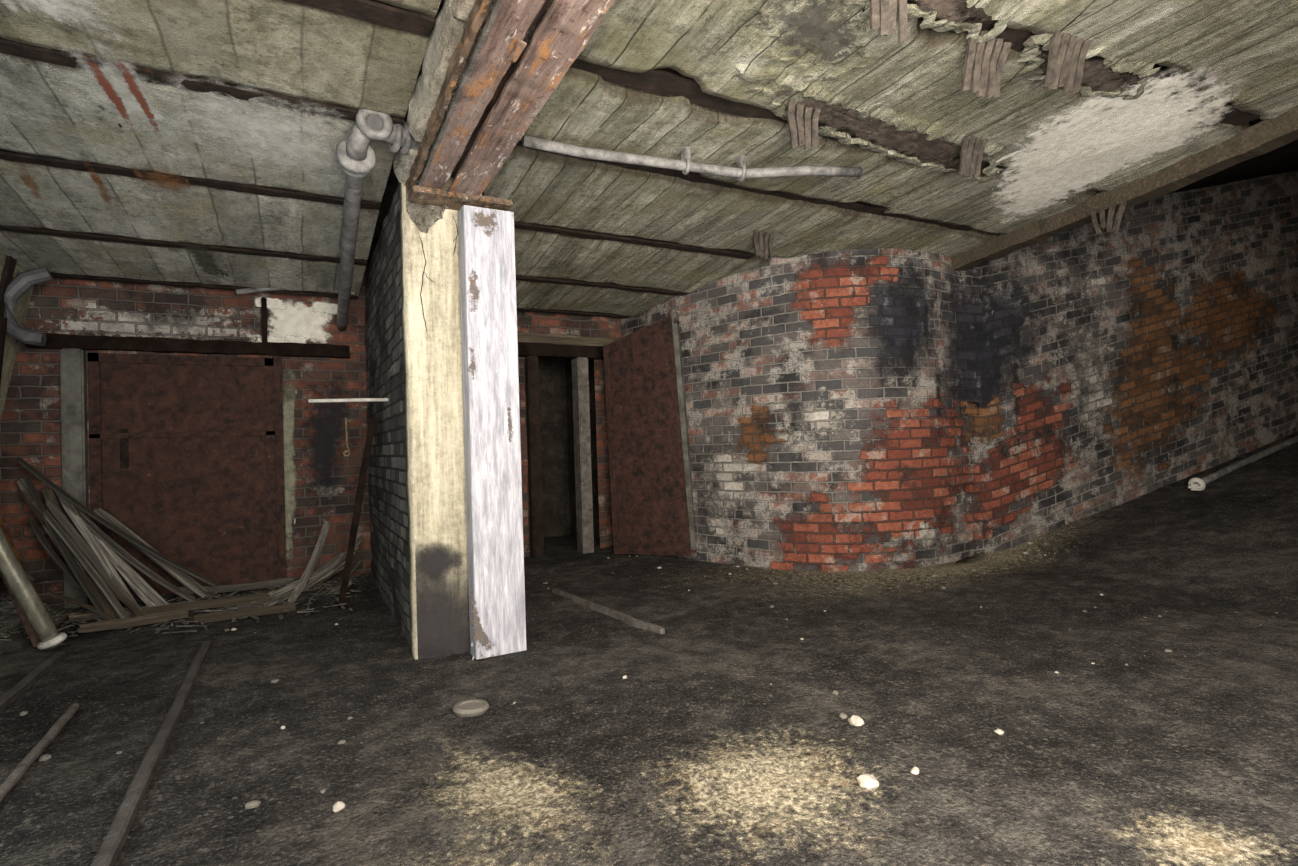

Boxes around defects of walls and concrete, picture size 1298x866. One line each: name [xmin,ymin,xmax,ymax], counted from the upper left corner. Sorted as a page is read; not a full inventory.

rust [70,62,157,131]
peeling [732,0,1018,182]
peeling [1017,33,1161,100]
peeling [852,267,899,306]
peeling [747,400,791,464]
peeling [961,401,982,415]
peeling [843,510,870,523]
peeling [880,522,954,562]